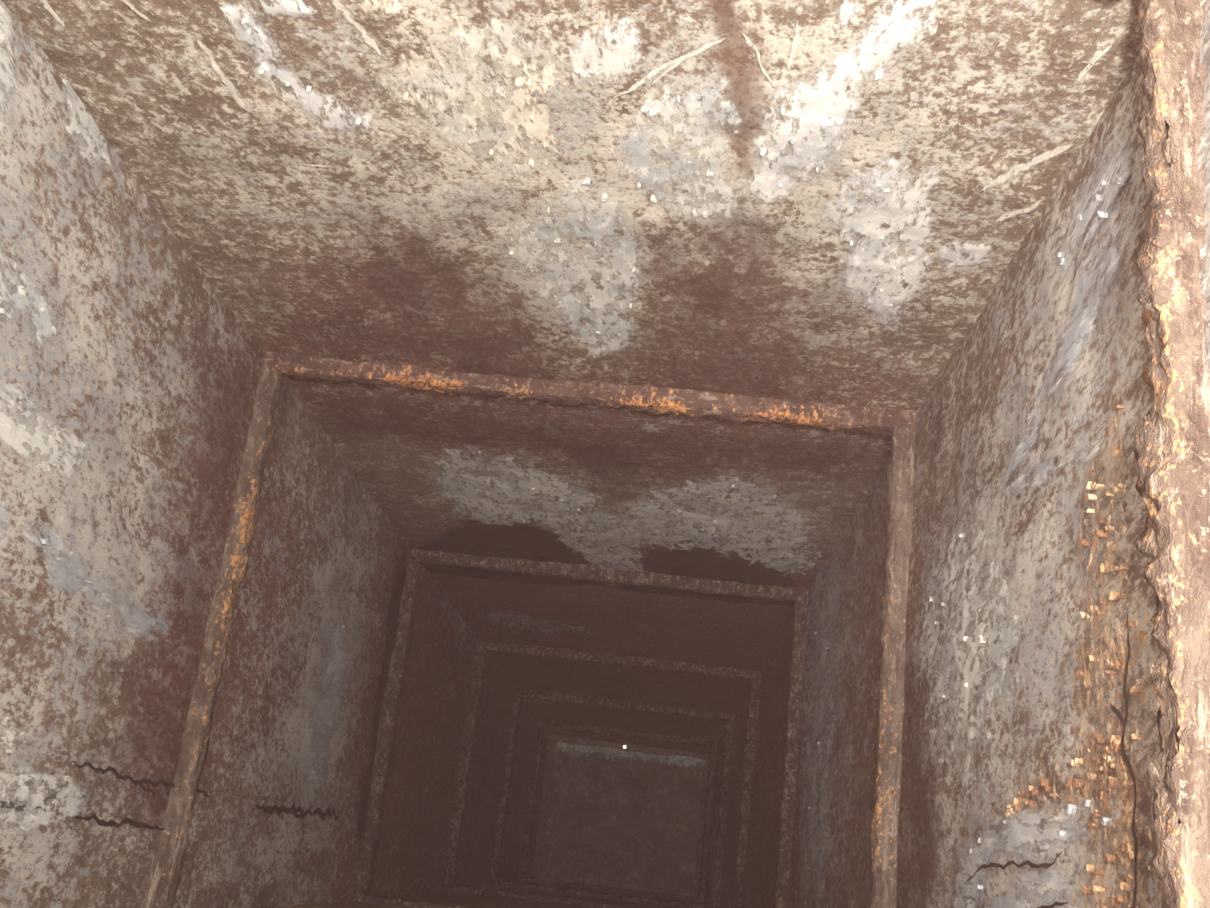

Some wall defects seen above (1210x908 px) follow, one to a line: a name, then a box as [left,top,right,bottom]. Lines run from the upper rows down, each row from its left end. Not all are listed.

leakage [197,39,248,110]
leakage [332,0,381,55]
leakage [652,52,697,85]
leakage [743,33,777,89]
leakage [787,20,800,69]
crack [1110,609,1138,908]
crack [0,761,212,830]
crack [254,803,342,821]
crack [967,851,1063,881]
crack [1038,900,1068,908]